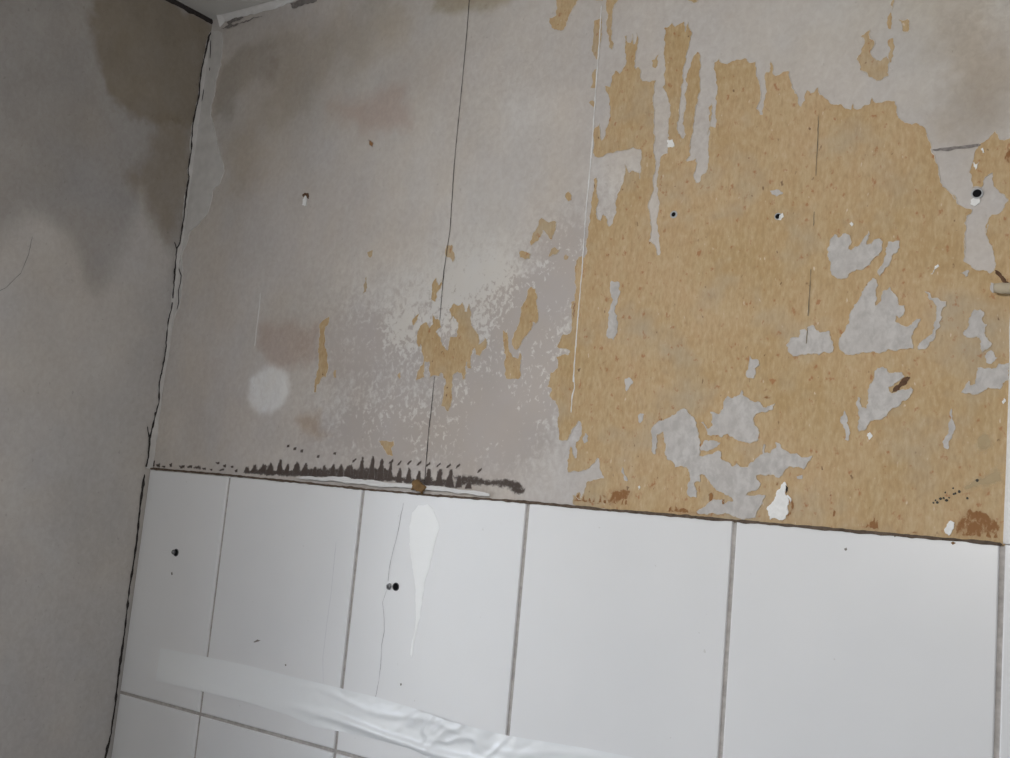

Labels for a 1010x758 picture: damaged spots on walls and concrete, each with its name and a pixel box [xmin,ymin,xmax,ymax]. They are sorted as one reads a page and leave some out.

damp [81,0,212,253]
damp [211,0,519,212]
peeling [314,316,337,393]
peeling [431,278,443,302]
peeling [412,302,487,412]
peeling [445,245,455,262]
peeling [502,287,539,379]
peeling [519,0,1010,538]